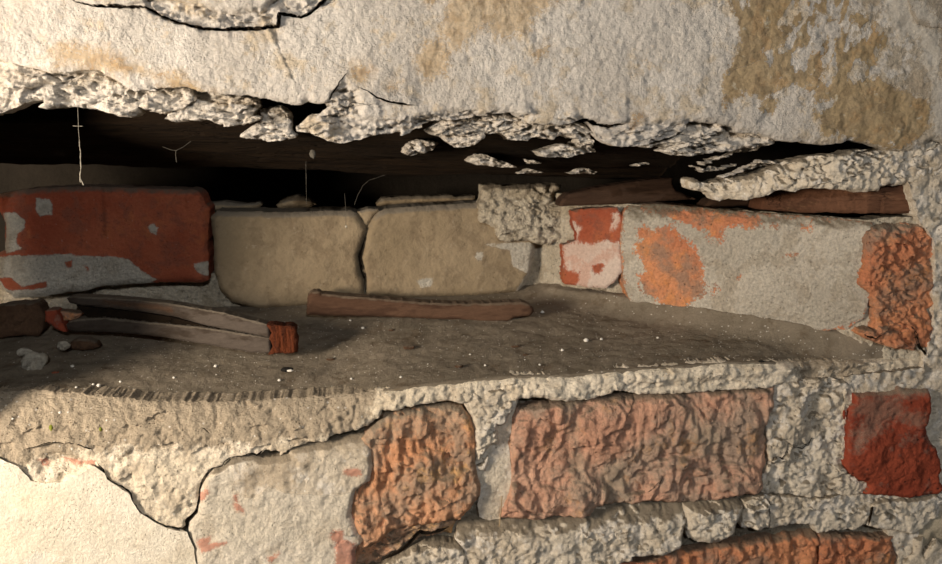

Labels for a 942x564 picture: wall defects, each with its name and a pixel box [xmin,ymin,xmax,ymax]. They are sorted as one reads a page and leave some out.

crack [73,0,335,31]
flaking render [0,60,298,142]
peeling [721,0,932,150]
damp [862,0,942,141]
flaking render [401,113,596,174]
flaking render [638,122,775,173]
spalling [357,206,379,227]
spalling [45,307,83,351]